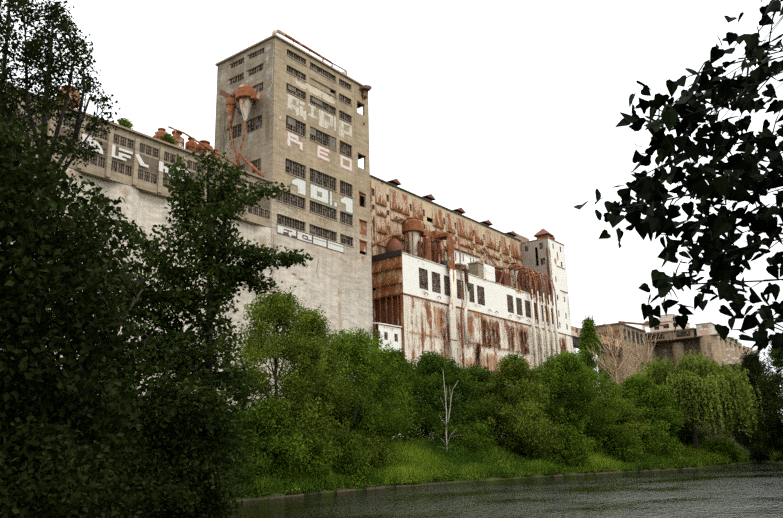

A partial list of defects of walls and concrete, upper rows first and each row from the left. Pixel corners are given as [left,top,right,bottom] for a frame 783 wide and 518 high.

rust [362,193,423,241]
rust [434,220,522,265]
rust [534,248,559,302]
rust [409,307,448,363]
rust [457,311,539,374]